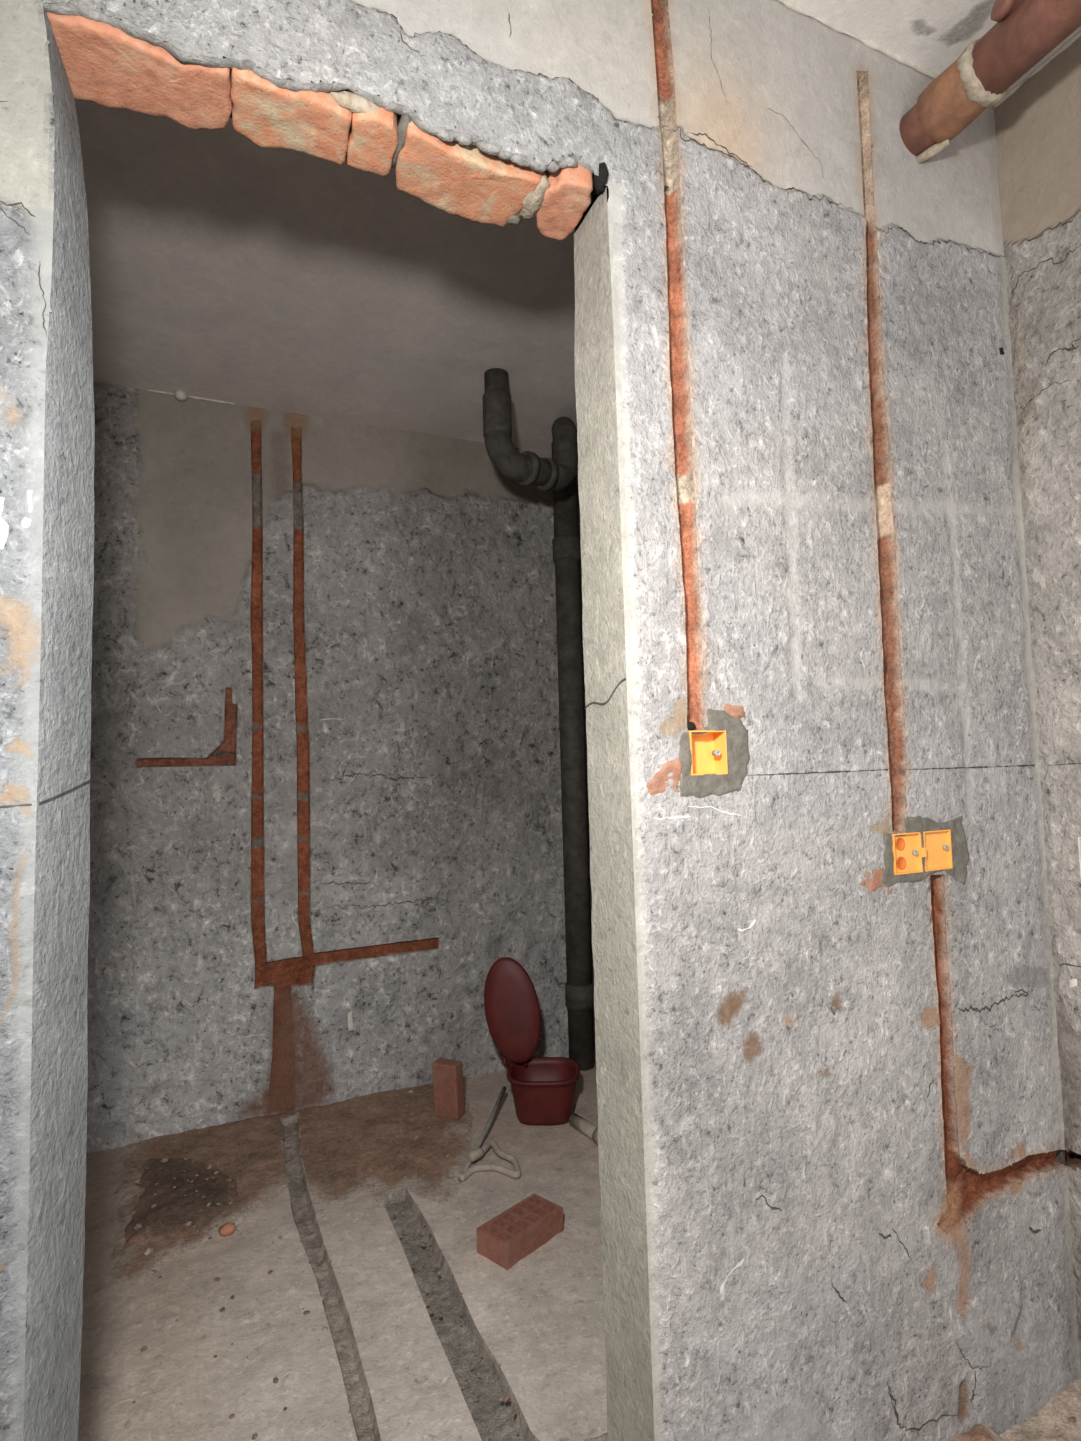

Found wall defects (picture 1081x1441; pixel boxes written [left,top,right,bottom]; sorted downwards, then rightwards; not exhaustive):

spalling [43,3,609,195]
crack [887,1344,990,1441]